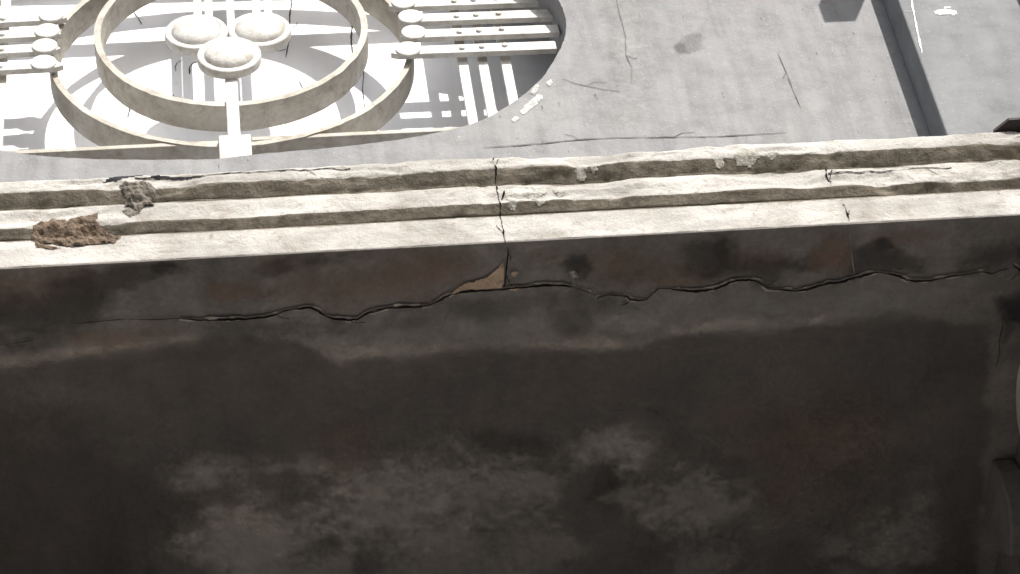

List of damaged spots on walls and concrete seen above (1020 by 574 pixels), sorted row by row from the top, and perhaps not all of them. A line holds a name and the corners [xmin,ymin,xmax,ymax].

crack [276,0,297,55]
spalling [103,175,204,217]
spalling [32,213,121,250]
crack [76,132,1020,324]
peeling [452,263,518,295]
water stain [0,314,986,574]